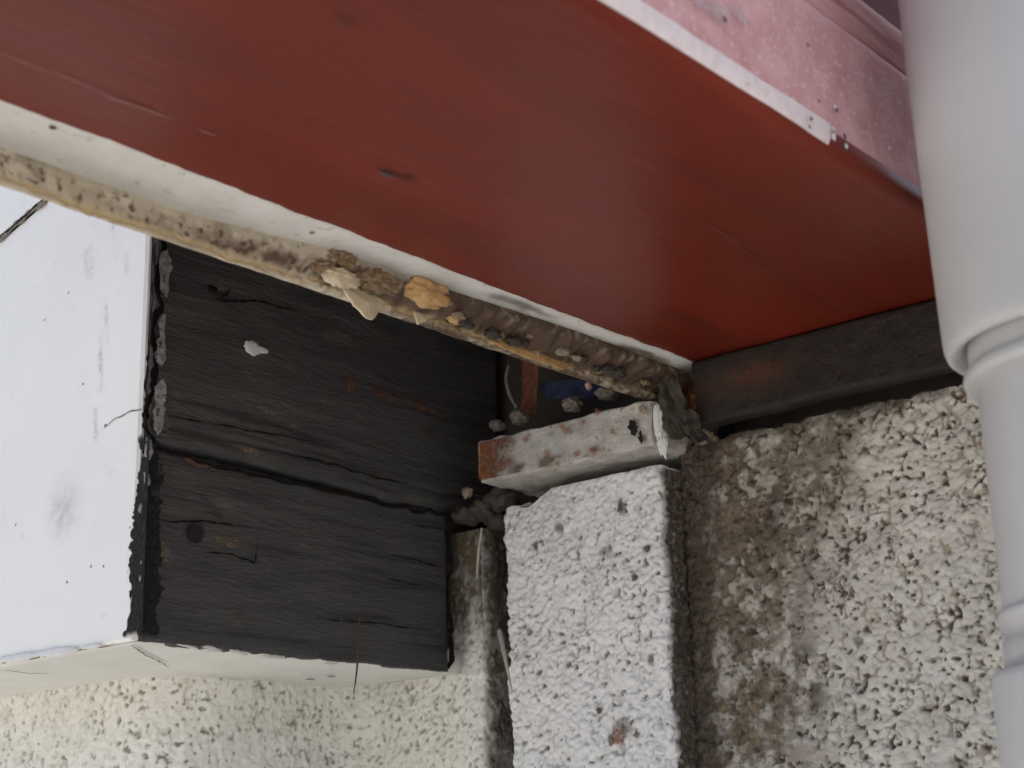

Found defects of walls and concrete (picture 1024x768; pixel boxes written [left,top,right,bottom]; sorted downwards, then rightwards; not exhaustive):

peeling [341,288,384,320]
peeling [413,311,428,325]
peeling [484,336,575,369]
peeling [627,404,646,444]
crack [103,409,451,530]
corrosion [478,435,528,481]
corrosion [539,450,561,468]
leakage [663,389,939,768]
crack [308,617,429,631]